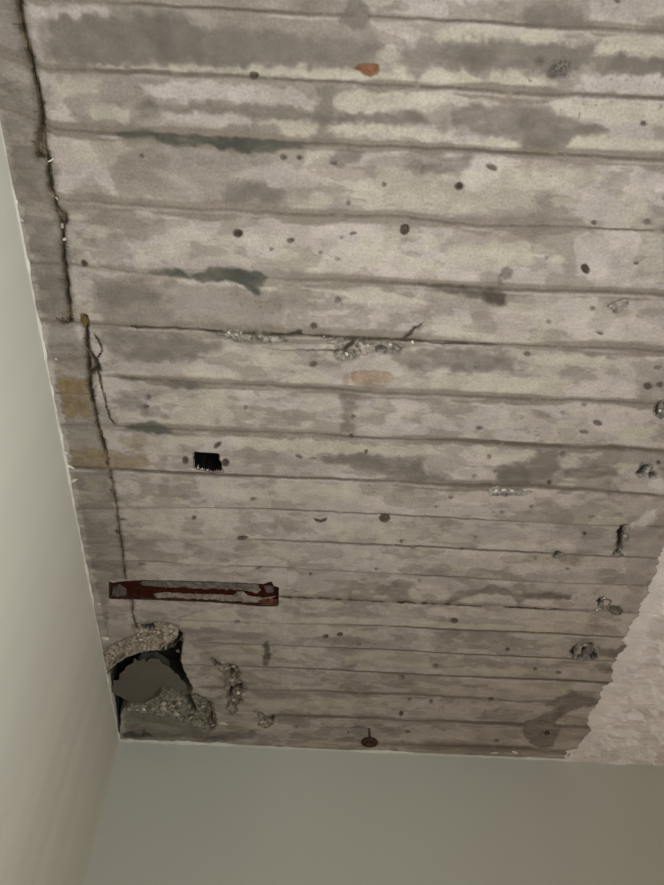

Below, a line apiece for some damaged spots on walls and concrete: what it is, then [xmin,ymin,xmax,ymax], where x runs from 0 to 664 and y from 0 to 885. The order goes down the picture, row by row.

damp [53,16,278,67]
crack [15,0,127,580]
damp [166,268,266,295]
spalling [323,336,414,361]
spalling [653,400,664,419]
spalling [635,462,656,479]
spalling [488,486,531,497]
spalling [611,524,629,557]
rust [109,580,279,607]
flaking render [564,546,664,766]
spalling [101,622,247,732]
damp [523,693,597,748]